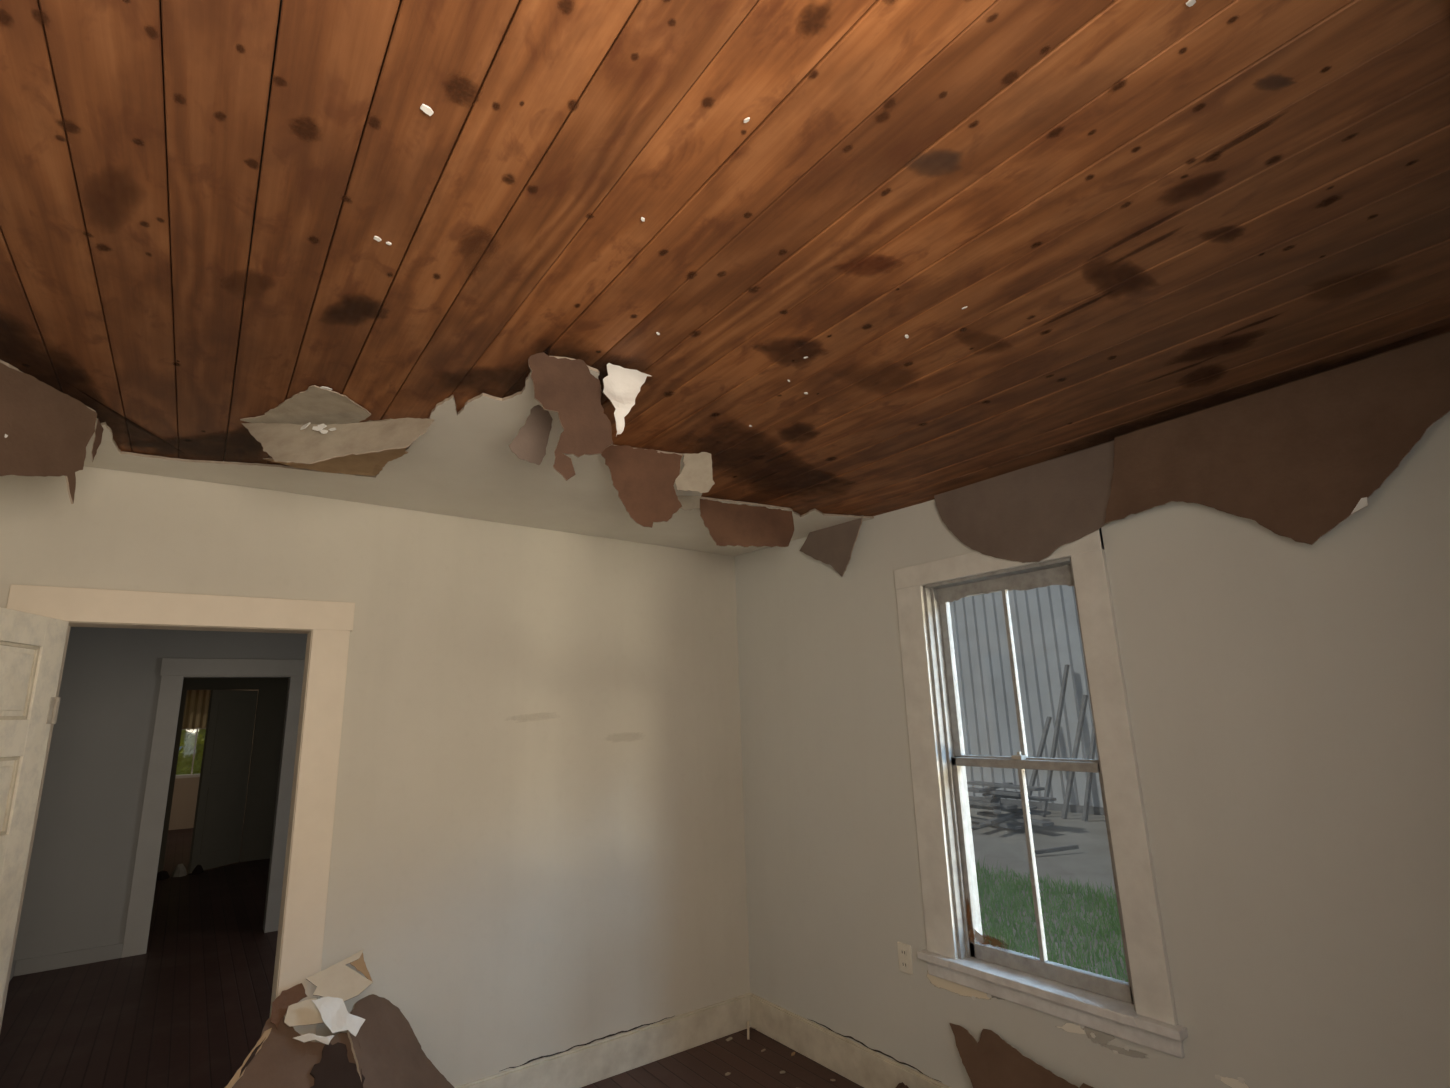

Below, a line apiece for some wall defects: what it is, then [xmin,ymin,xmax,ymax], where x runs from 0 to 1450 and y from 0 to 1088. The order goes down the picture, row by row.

leakage [1046,118,1277,324]
leakage [760,340,822,363]
peeling [91,419,104,462]
leakage [0,319,261,463]
peeling [240,385,435,476]
peeling [603,363,652,436]
peeling [675,452,715,510]
leakage [699,424,838,495]
peeling [1351,497,1368,514]
peeling [1056,1023,1144,1058]